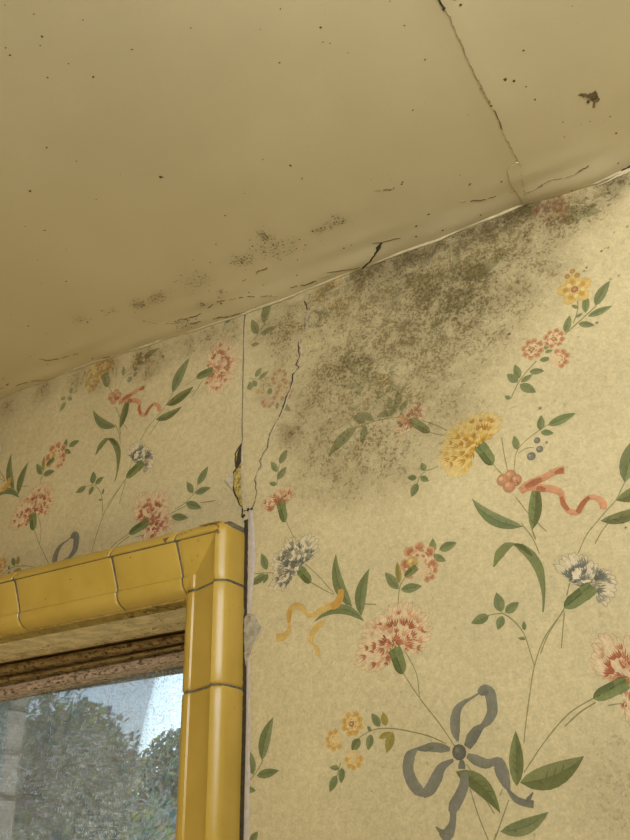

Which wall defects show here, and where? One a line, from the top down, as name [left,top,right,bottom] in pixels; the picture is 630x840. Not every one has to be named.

crack [438,0,589,204]
crack [597,166,630,187]
crack [147,238,400,518]
water stain [264,173,628,492]